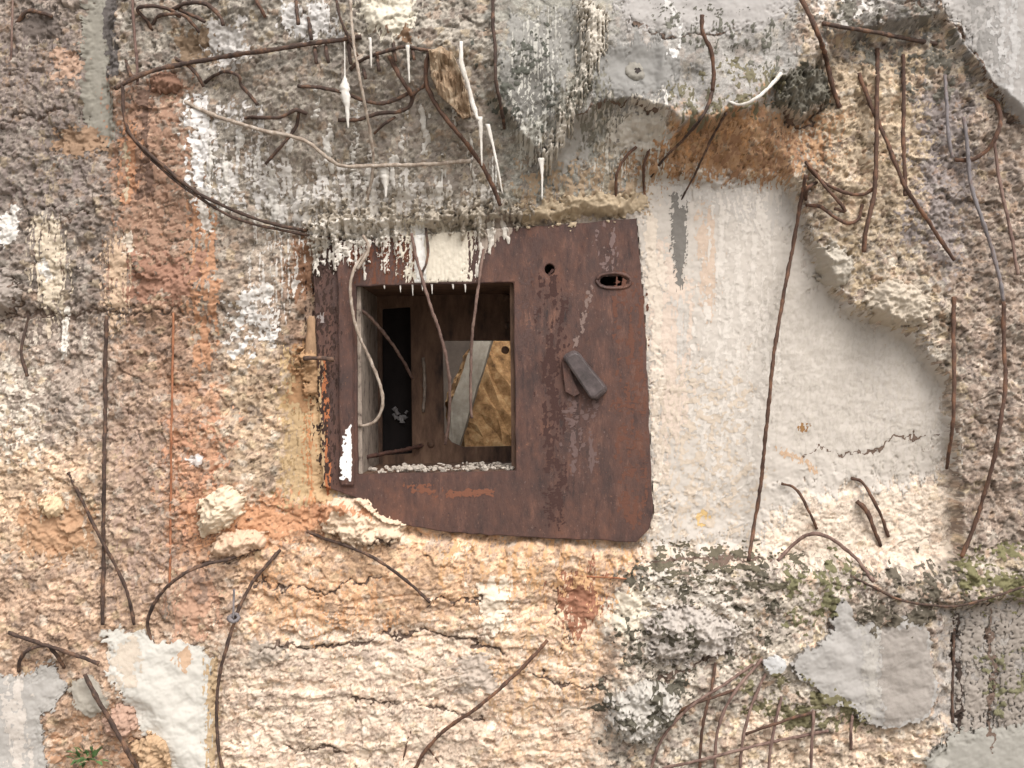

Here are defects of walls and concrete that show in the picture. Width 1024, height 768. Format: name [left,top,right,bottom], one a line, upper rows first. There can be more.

peeling [0,0,587,236]
corrosion [46,13,225,381]
water stain [174,0,967,677]
peeling [537,0,1024,768]
corrosion [403,483,495,499]
corrosion [423,269,643,737]
crack [802,430,948,458]
crack [258,594,505,655]
crack [351,696,485,721]
crack [528,587,608,690]
water stain [663,653,745,686]
water stain [855,621,935,727]